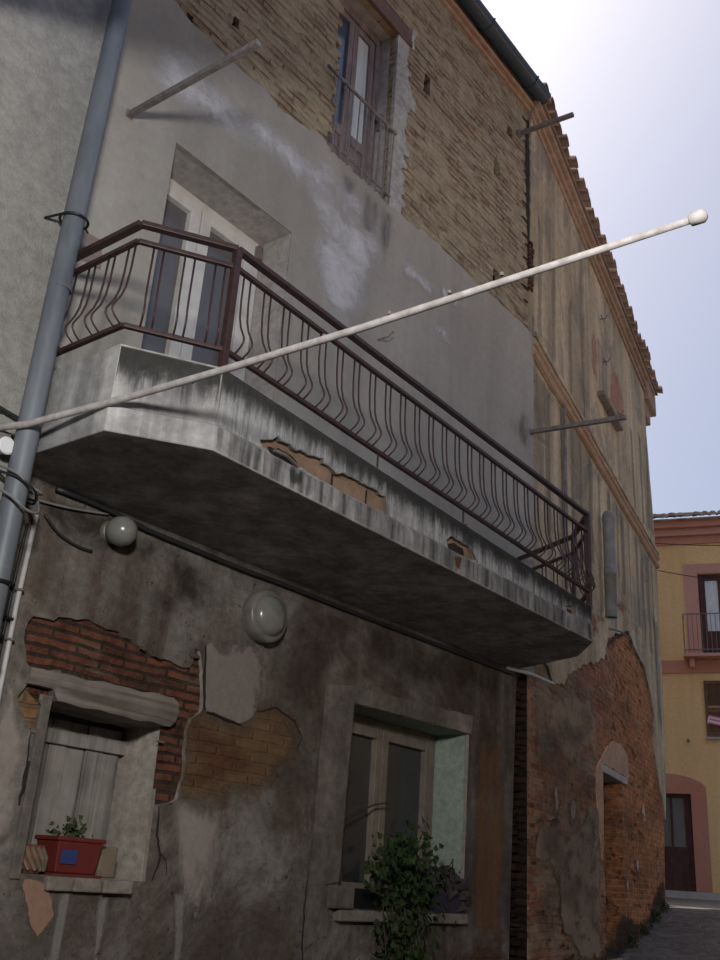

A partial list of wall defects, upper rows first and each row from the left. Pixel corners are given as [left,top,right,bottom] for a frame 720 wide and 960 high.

leakage [163,60,239,126]
leakage [252,123,376,310]
spalling [260,439,384,513]
spalling [447,537,478,568]
flaking render [17,685,49,734]
flaking render [24,617,303,804]